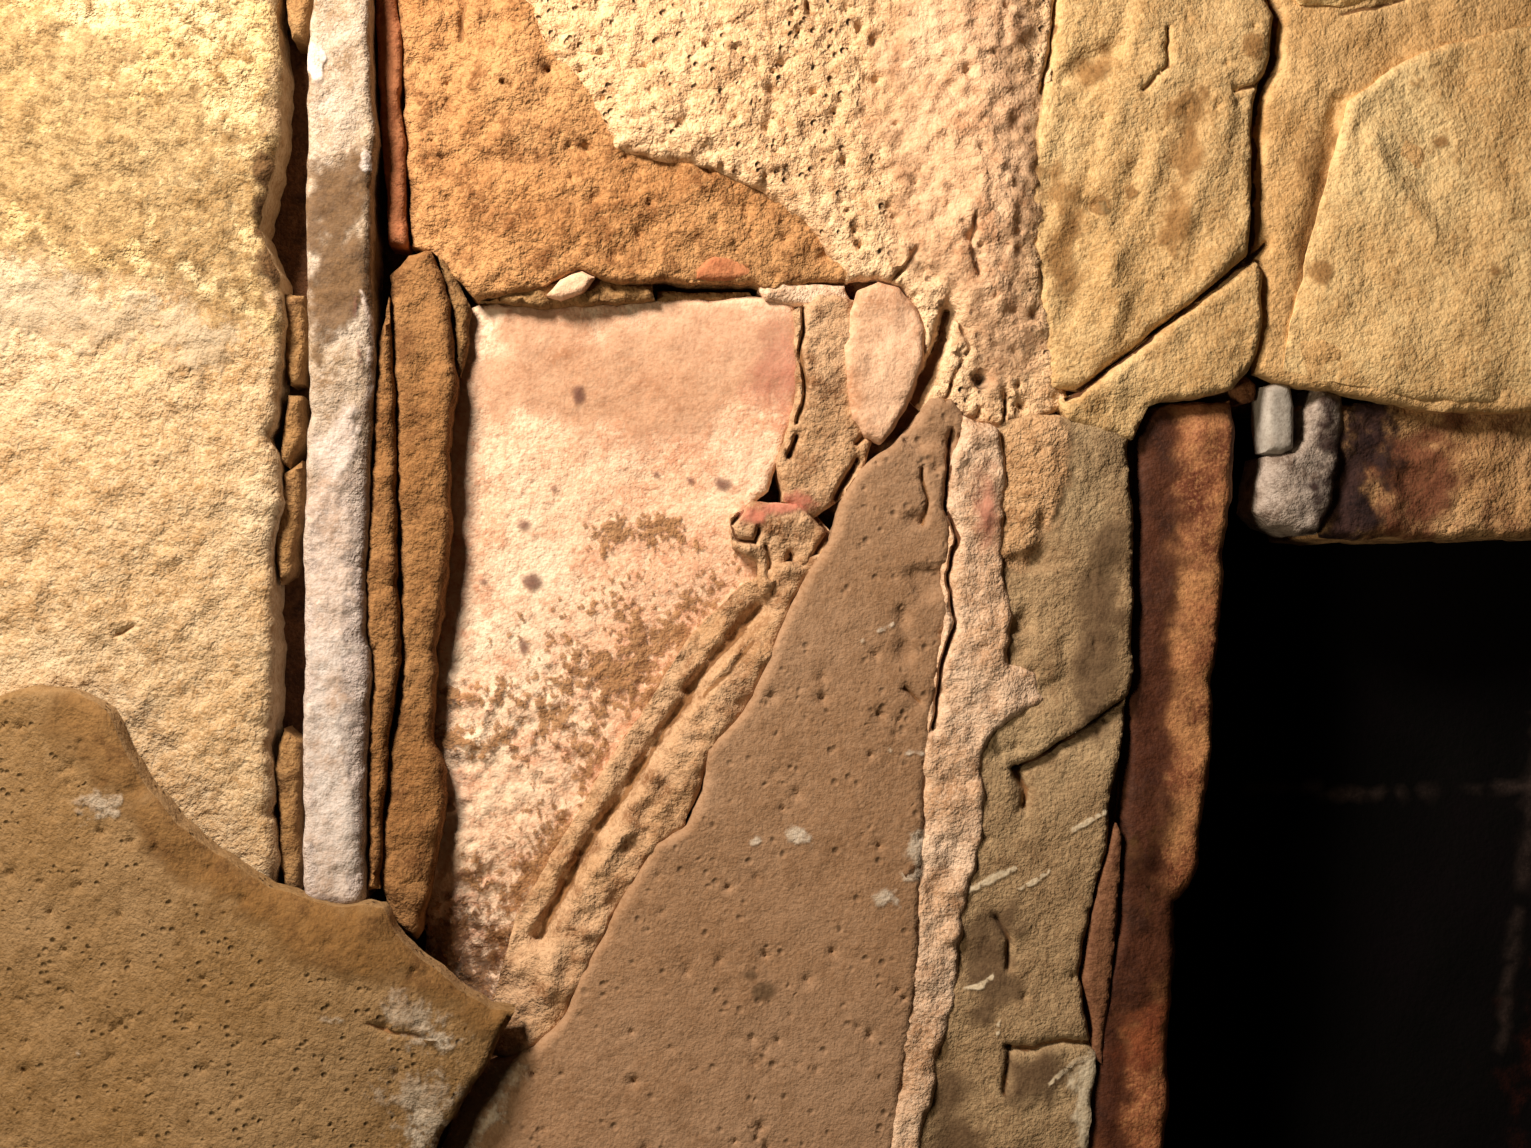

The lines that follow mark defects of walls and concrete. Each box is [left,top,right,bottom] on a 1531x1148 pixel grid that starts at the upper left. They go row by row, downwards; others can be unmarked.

leakage [0,0,283,384]
leakage [306,151,372,363]
spalling [398,0,925,445]
crack [1039,1,1057,94]
crack [1064,0,1279,401]
leakage [47,692,508,1053]
leakage [375,1067,462,1148]
leakage [466,1060,524,1148]